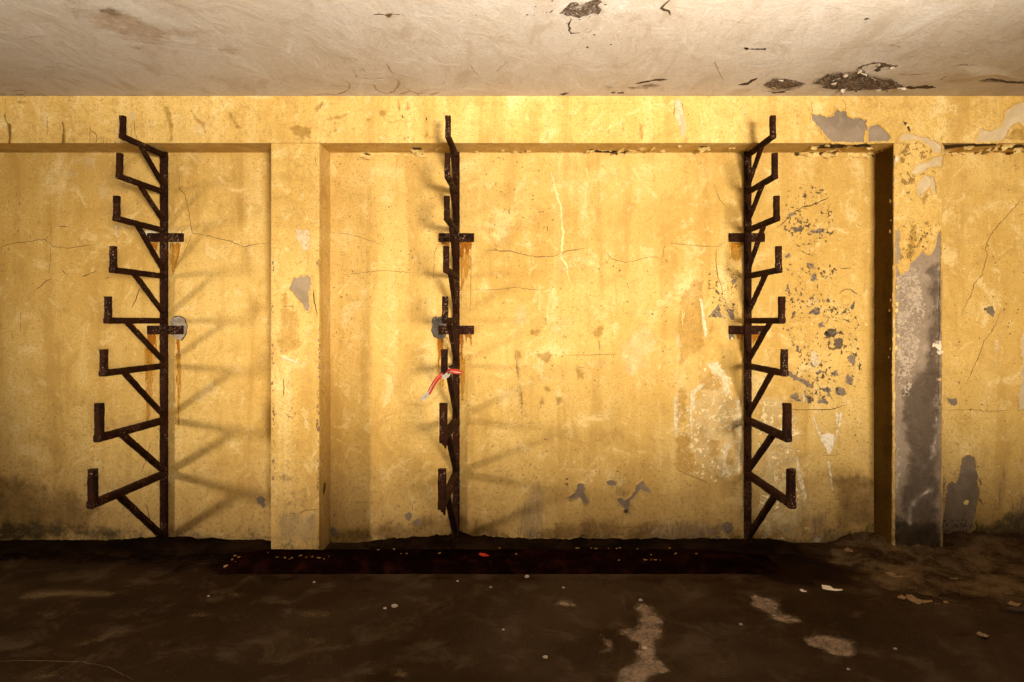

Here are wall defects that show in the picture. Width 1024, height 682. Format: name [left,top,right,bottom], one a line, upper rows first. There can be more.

spalling [526,0,607,48]
peeling [738,62,1024,200]
peeling [288,259,319,314]
rust [441,242,472,302]
crack [485,174,730,312]
peeling [782,185,868,405]
crack [961,201,1020,316]
rust [145,334,157,421]
peeling [892,203,1024,548]
peeling [564,478,590,506]
peeling [606,463,653,529]